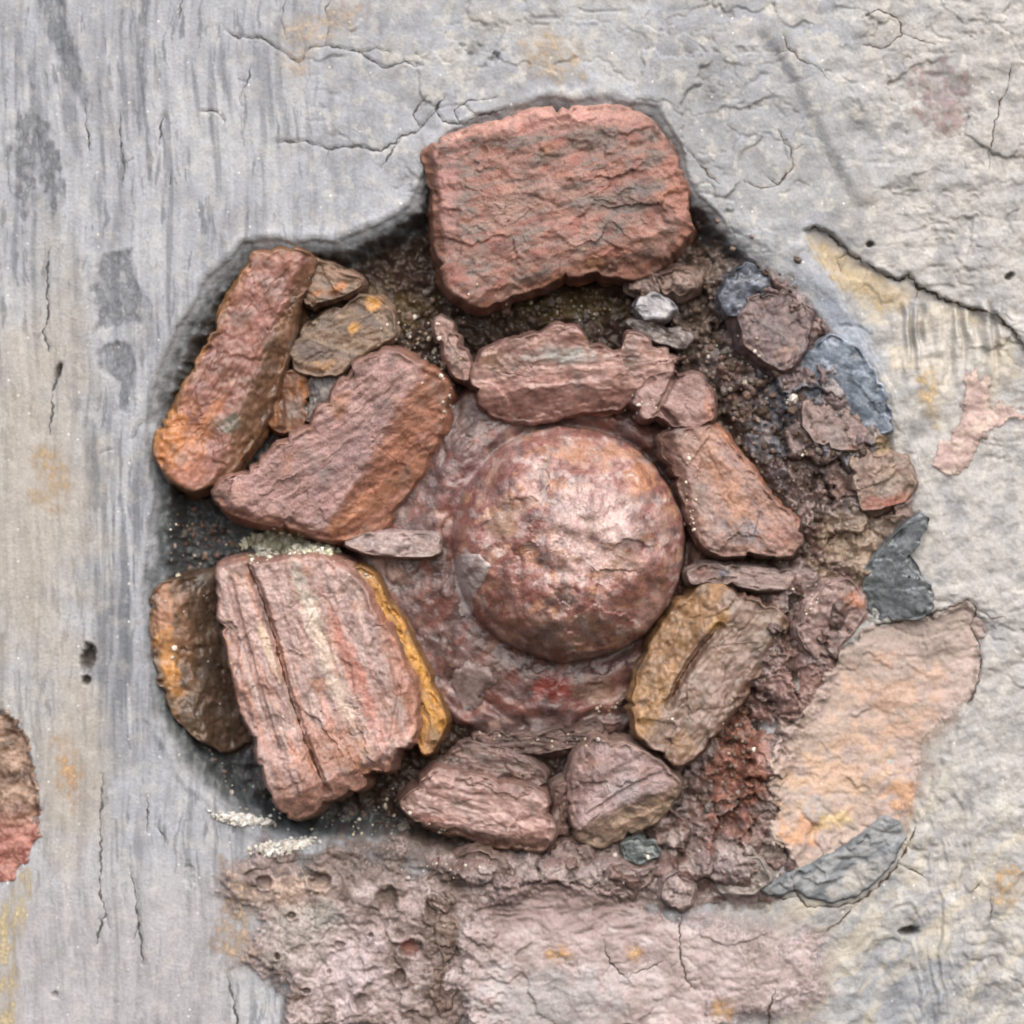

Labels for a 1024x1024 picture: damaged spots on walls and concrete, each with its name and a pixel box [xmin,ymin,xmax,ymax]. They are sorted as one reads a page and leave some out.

water stain [38,0,81,88]
crack [229,0,424,73]
water stain [8,116,62,220]
crack [279,95,506,168]
water stain [99,344,131,406]
water stain [95,250,141,328]
peeling [623,261,815,380]
crack [805,225,1023,346]
peeling [797,398,919,518]
spalling [713,510,986,904]
spalling [0,709,42,882]
peeling [215,772,827,1024]